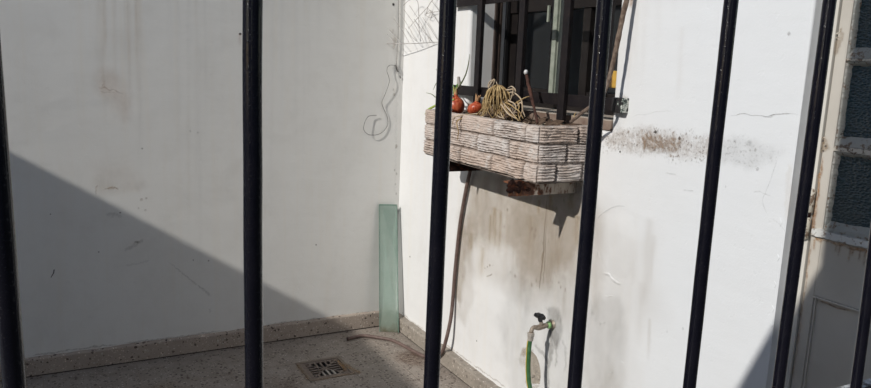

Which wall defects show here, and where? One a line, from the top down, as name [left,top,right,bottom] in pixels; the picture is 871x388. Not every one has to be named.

leakage [615,130,692,160]
corrosion [506,179,531,194]